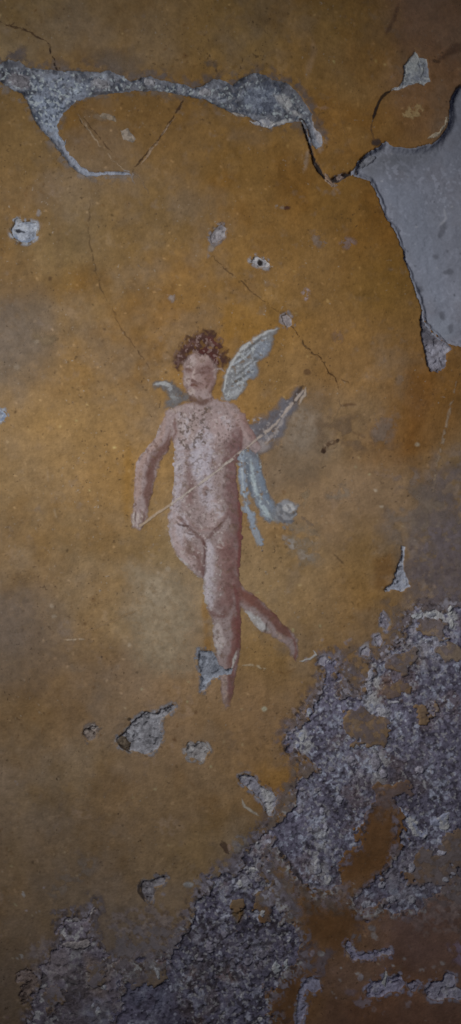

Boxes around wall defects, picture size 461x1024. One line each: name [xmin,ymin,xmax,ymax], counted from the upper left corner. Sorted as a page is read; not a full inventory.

spalling [392,52,430,91]
crack [81,101,183,180]
spalling [0,49,327,178]
crack [299,118,357,187]
crack [371,90,391,145]
spalling [9,210,40,245]
peeling [351,87,461,373]
spalling [16,546,461,1024]